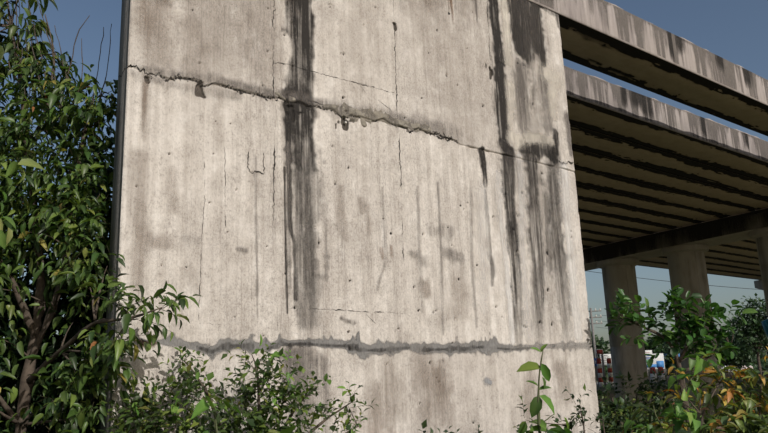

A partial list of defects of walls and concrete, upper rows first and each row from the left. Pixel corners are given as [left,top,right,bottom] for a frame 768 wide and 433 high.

damp [222,0,323,314]
crack [119,0,458,186]
damp [478,0,768,344]